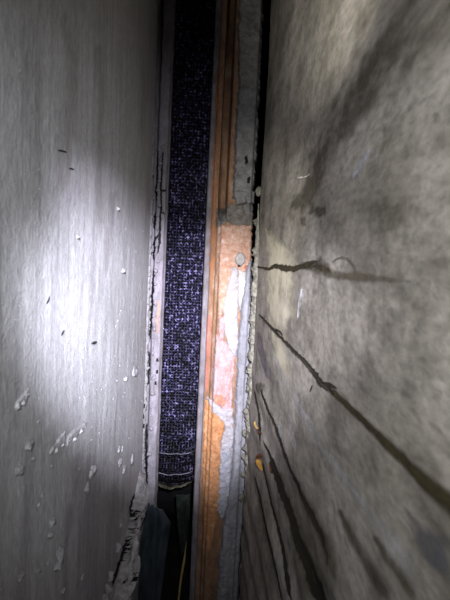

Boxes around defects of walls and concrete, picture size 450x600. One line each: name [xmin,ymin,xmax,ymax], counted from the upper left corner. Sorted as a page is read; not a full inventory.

crack [147,151,166,385]
crack [257,257,377,280]
crack [142,424,150,484]
crack [254,390,334,600]
crack [259,314,450,514]